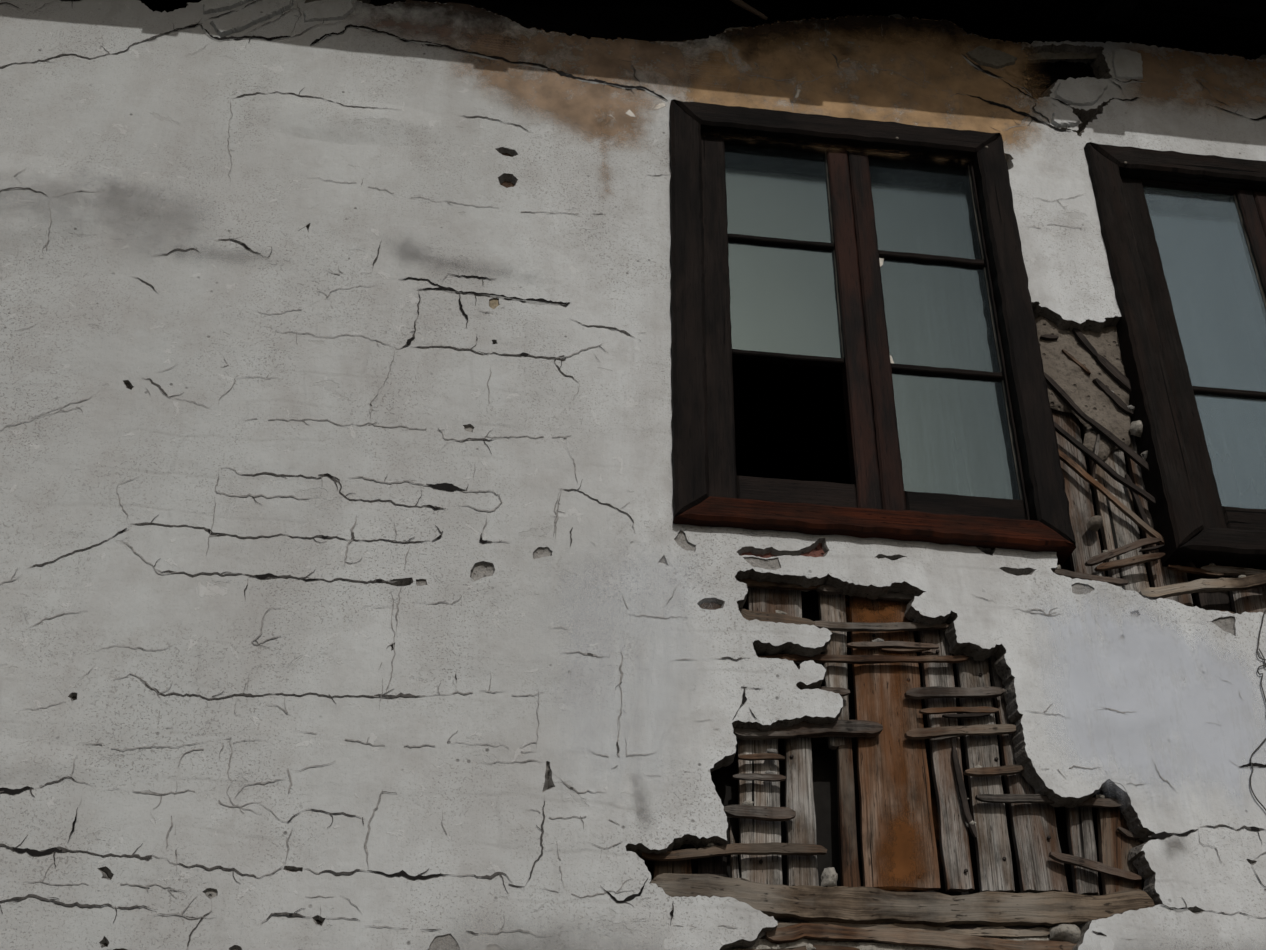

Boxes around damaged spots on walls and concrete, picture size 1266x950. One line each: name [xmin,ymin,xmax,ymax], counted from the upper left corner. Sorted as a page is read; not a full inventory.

crack [228,87,401,182]
crack [0,0,668,102]
water stain [369,0,693,141]
water stain [716,15,974,58]
crack [950,55,1071,131]
flaking render [1022,49,1143,128]
flaking render [1035,315,1266,635]
crack [0,236,690,950]
peeling [675,532,695,551]
flaking render [799,543,825,557]
flaking render [641,578,1155,950]
crack [1231,761,1266,769]